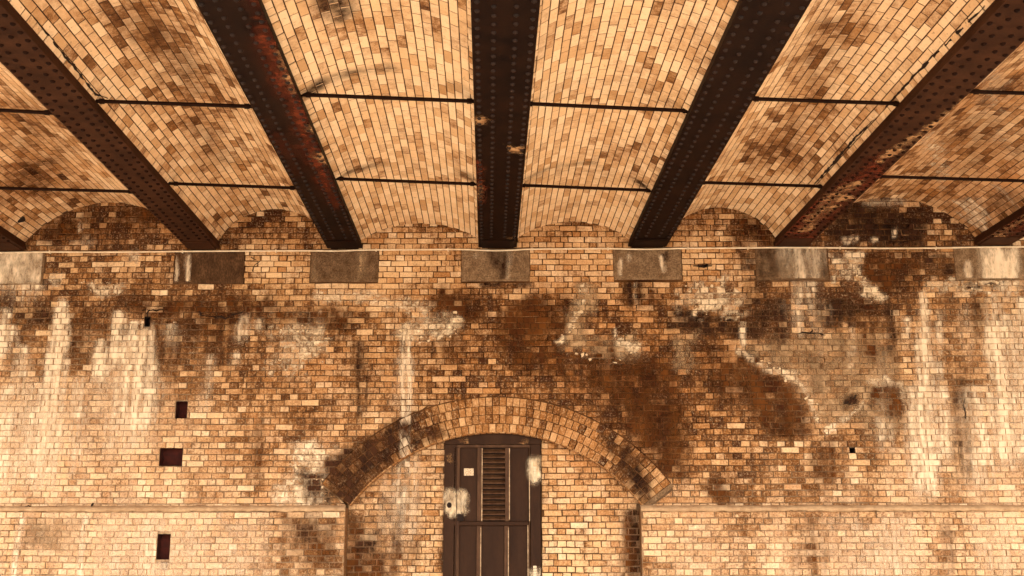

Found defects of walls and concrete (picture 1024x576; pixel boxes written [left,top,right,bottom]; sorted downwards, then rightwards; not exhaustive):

damp [430,289,483,352]
damp [497,282,580,375]
damp [580,333,686,477]
damp [624,282,654,306]
damp [694,321,806,438]
damp [734,216,819,343]
damp [826,230,1024,495]
damp [707,480,735,505]
damp [806,544,817,575]